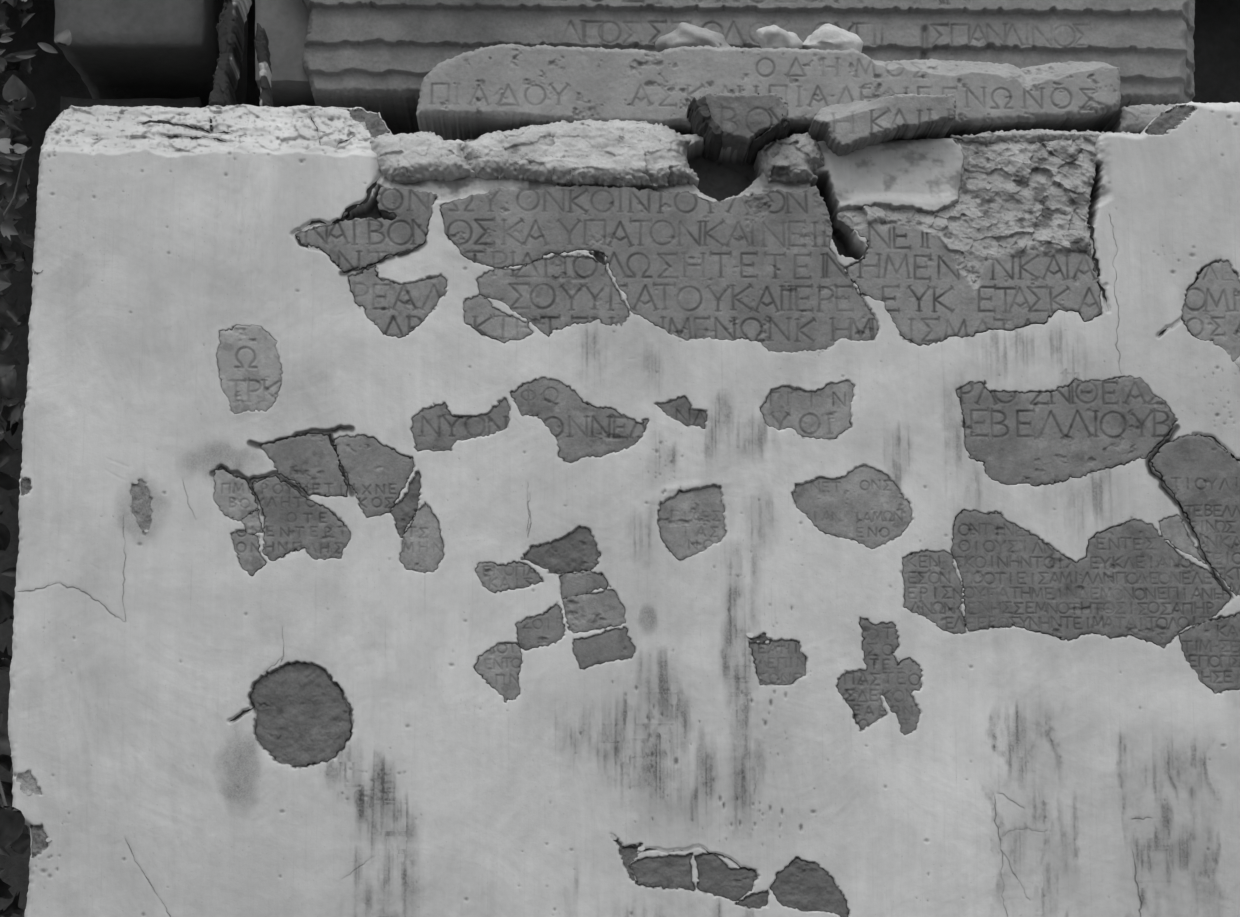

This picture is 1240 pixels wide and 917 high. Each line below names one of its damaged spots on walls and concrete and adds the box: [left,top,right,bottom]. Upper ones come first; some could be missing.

spalling [610,834,645,884]